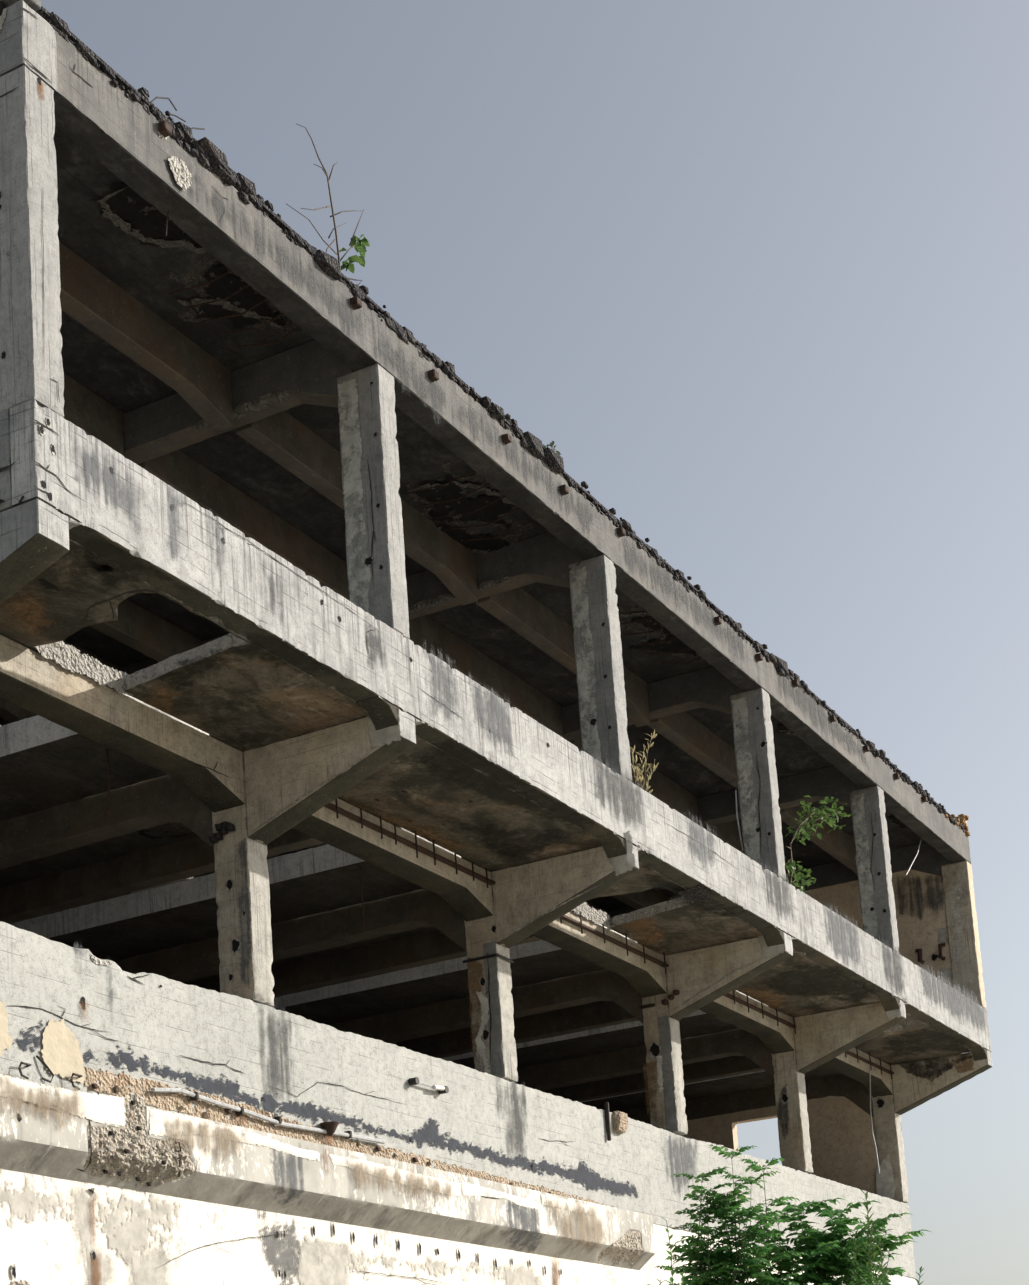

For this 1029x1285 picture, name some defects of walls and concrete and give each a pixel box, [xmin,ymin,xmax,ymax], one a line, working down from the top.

spalling [168,156,192,191]
spalling [35,641,132,696]
damp [148,635,342,712]
damp [881,876,985,1079]
crack [10,1005,121,1042]
damp [261,1013,291,1097]
peeling [475,978,491,1073]
damp [498,1084,526,1155]
damp [271,1151,304,1204]
spalling [0,1067,614,1285]
rust [92,1258,101,1285]